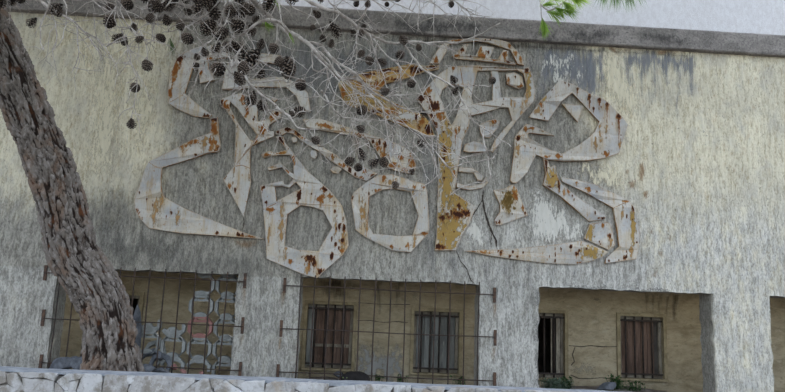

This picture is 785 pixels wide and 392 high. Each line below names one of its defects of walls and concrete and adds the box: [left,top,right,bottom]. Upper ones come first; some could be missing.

leakage [514,32,603,96]
leakage [626,51,696,88]
corrosion [340,56,471,250]
corrosion [501,186,526,215]
crack [569,345,617,379]